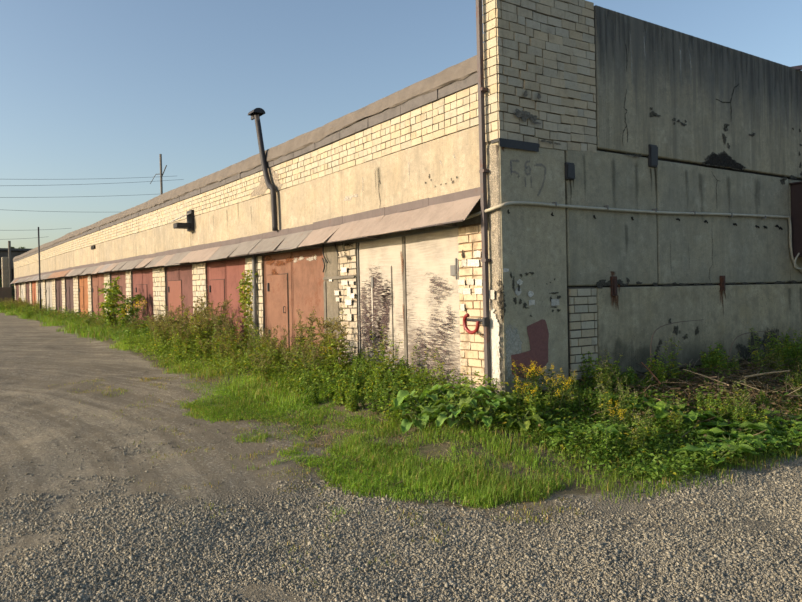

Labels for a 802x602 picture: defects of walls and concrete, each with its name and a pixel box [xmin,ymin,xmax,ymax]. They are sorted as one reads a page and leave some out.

spalling [702,124,746,170]